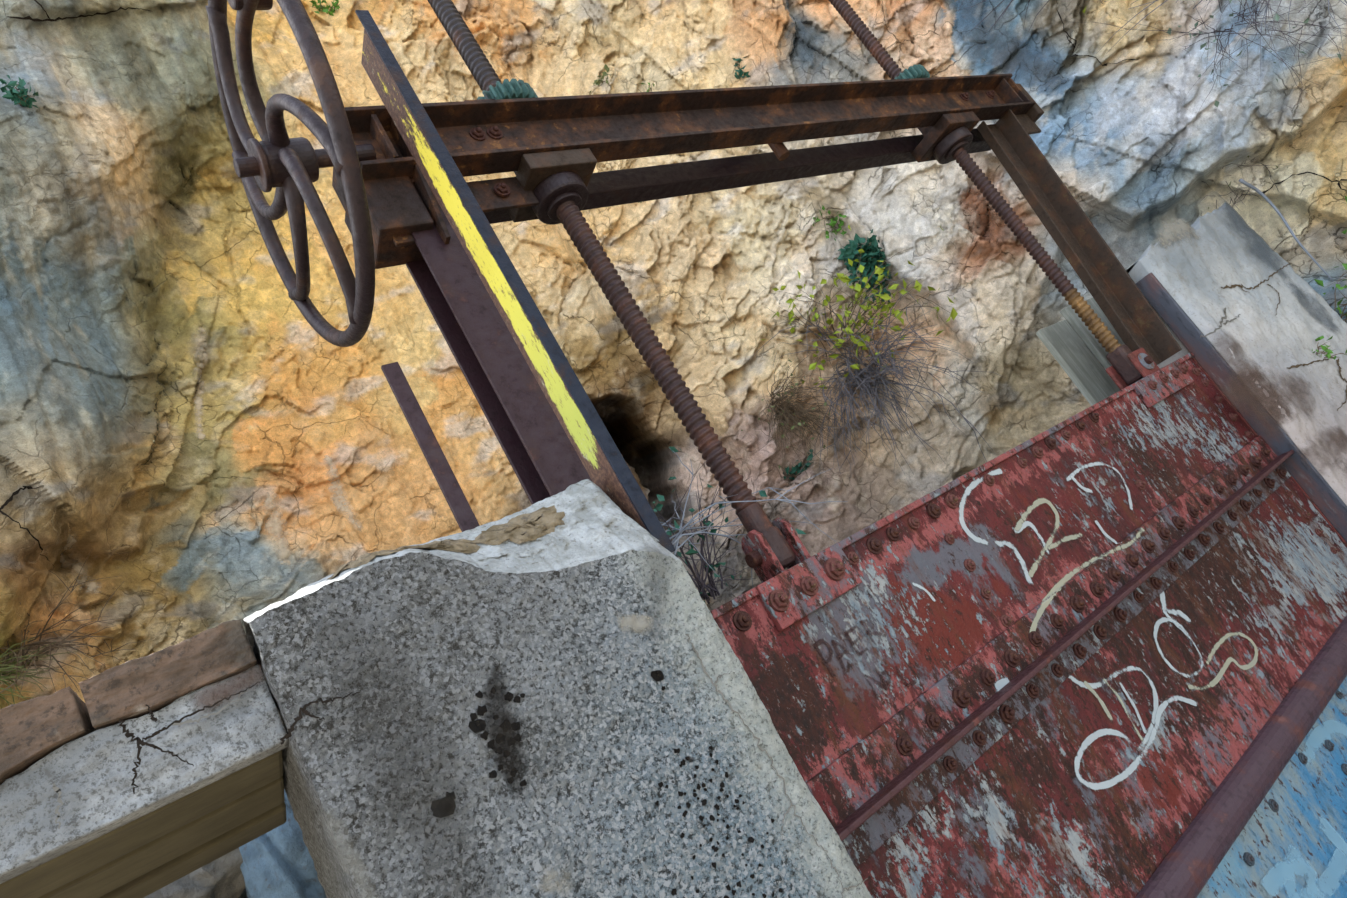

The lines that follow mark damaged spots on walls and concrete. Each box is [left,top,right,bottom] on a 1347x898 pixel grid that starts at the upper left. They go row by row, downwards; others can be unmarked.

crack [1200,263,1290,338]
rust [1227,342,1307,424]
crack [1286,358,1347,411]
crack [119,682,260,794]
water stain [487,668,524,792]